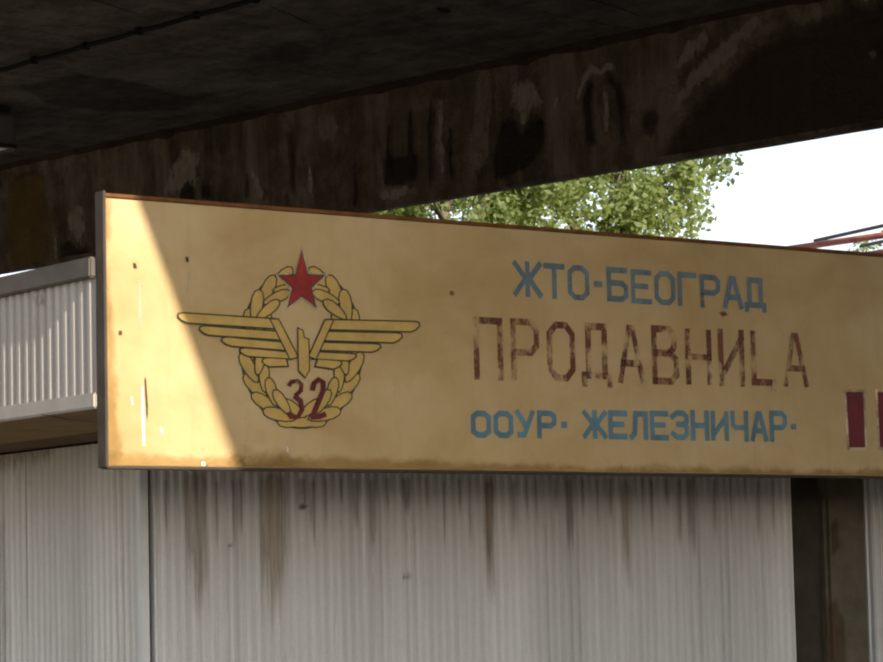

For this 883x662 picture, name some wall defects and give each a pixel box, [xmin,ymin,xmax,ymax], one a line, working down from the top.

leakage [380,111,417,201]
leakage [469,70,559,180]
leakage [187,473,206,586]